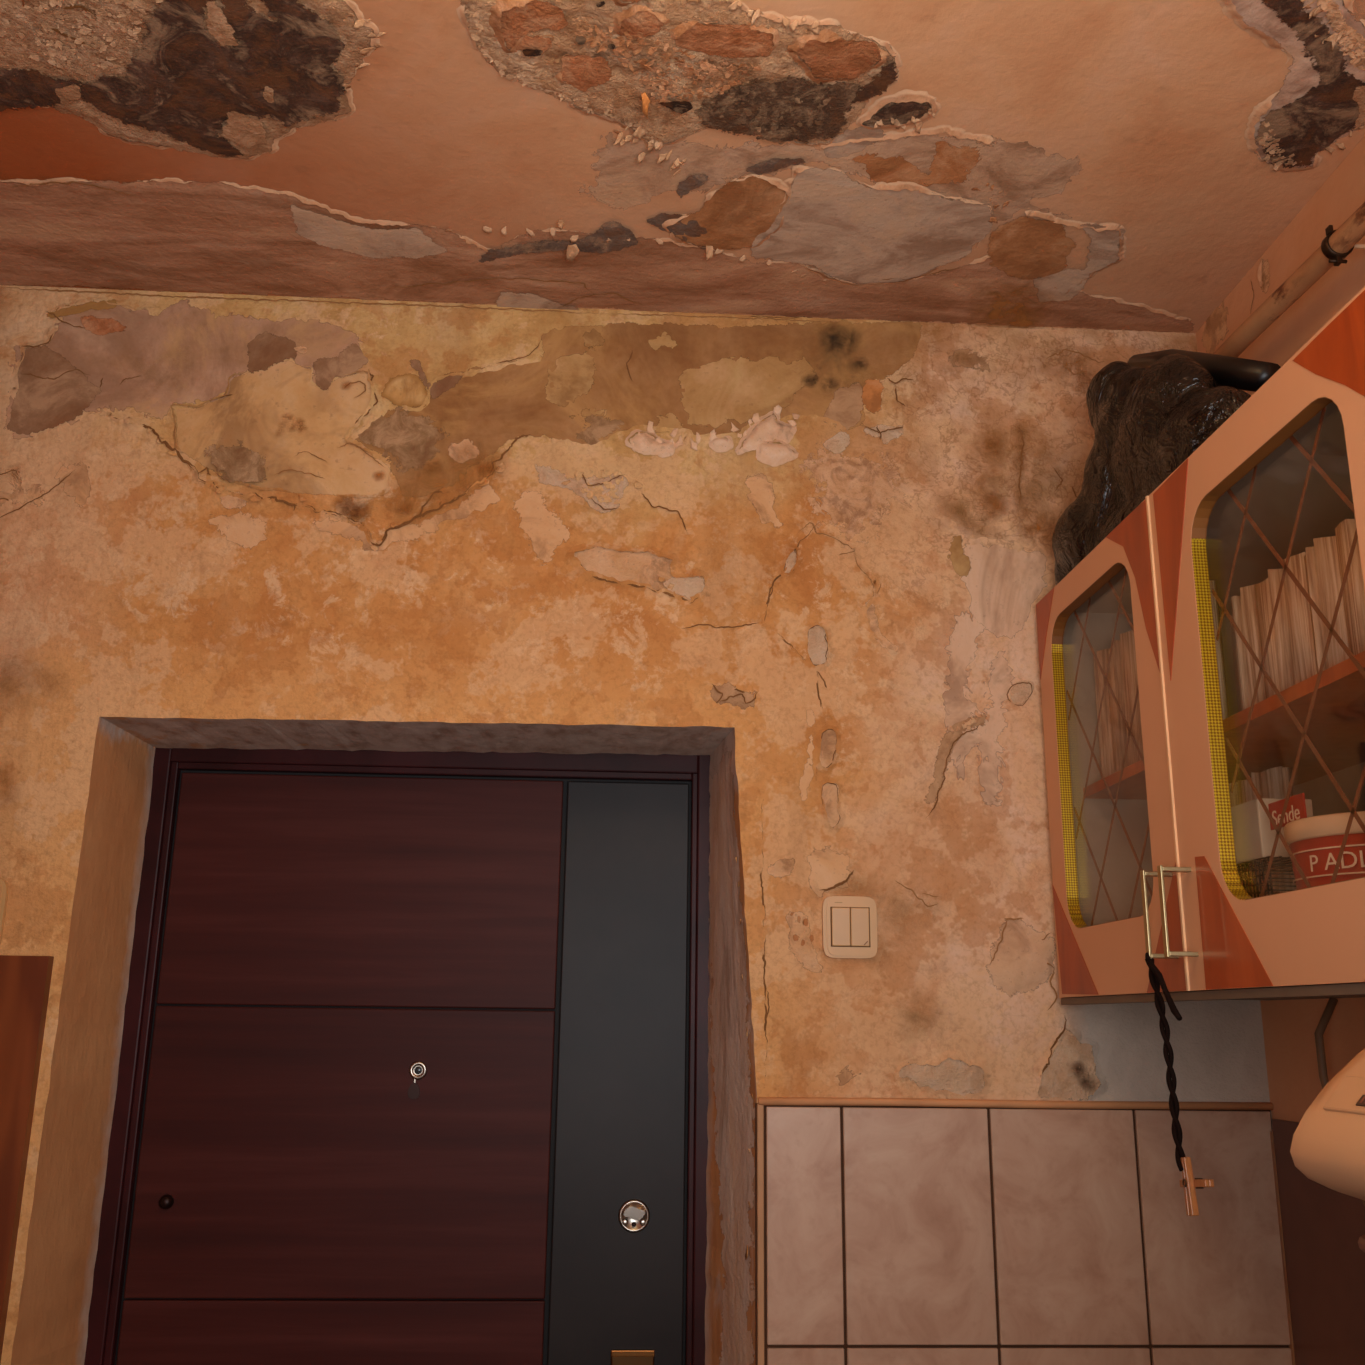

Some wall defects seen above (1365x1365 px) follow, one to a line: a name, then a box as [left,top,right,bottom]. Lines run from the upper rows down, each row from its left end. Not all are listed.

flaking render [1217,0,1365,173]
peeling [0,0,1194,608]
crack [100,408,530,546]
crack [343,374,378,439]
peeling [710,682,757,710]
crack [682,522,883,781]
peeling [925,514,1047,816]
crack [755,799,770,1088]
flaking render [1027,1018,1109,1101]